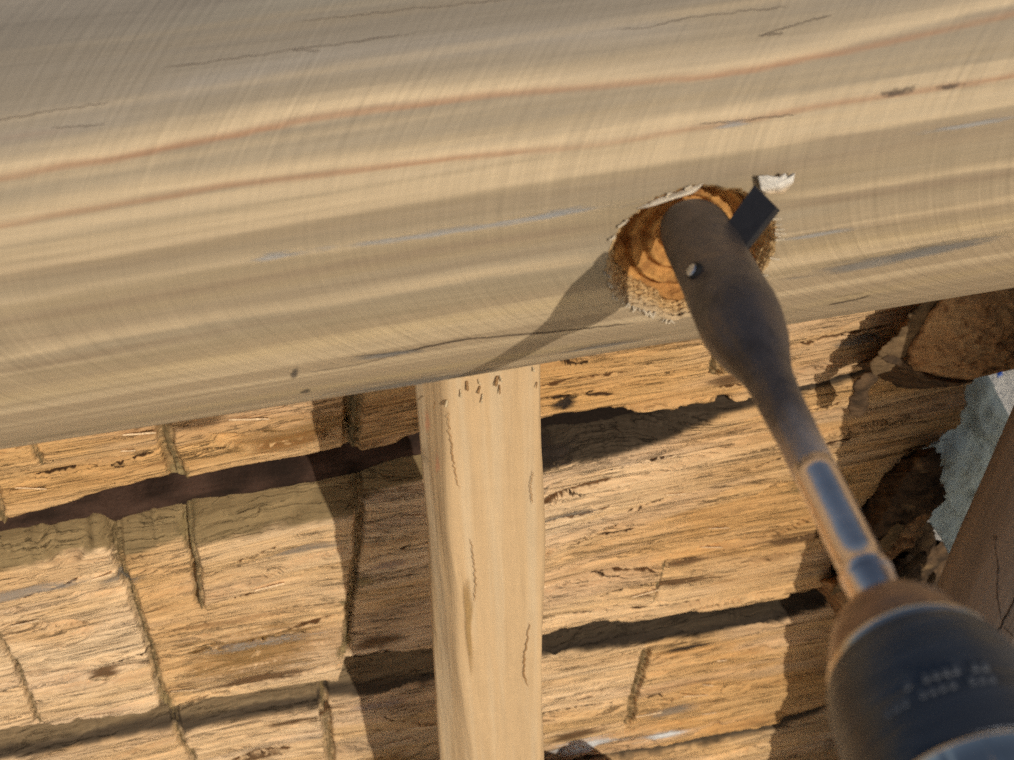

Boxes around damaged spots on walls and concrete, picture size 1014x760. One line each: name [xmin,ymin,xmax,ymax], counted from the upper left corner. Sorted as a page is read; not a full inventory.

crack [994,543,1014,637]